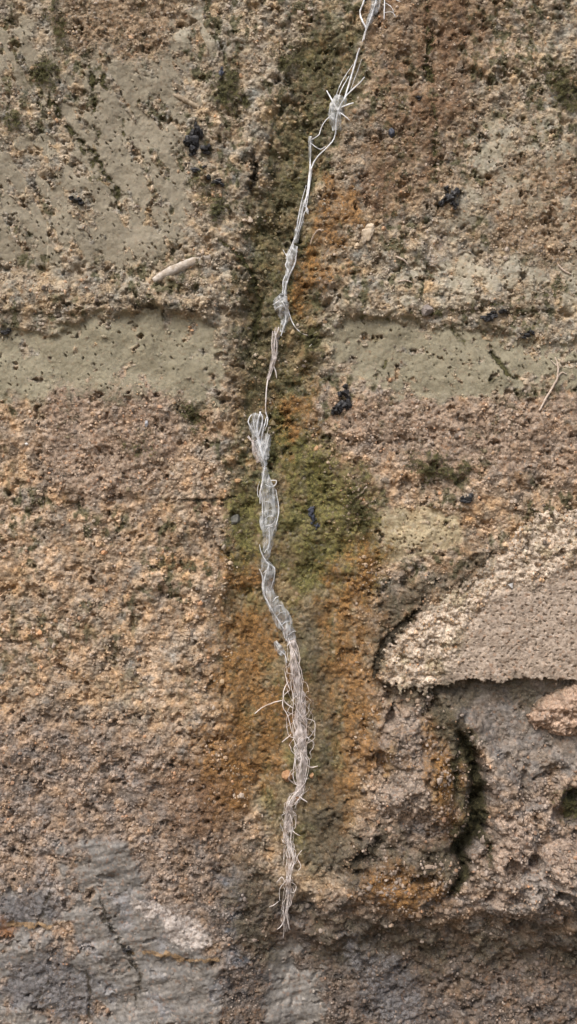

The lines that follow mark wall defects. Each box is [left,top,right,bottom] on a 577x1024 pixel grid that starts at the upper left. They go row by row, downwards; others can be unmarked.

corrosion [369,0,490,184]
corrosion [280,142,399,315]
water stain [223,482,270,576]
corrosion [162,534,389,849]
water stain [301,720,463,886]